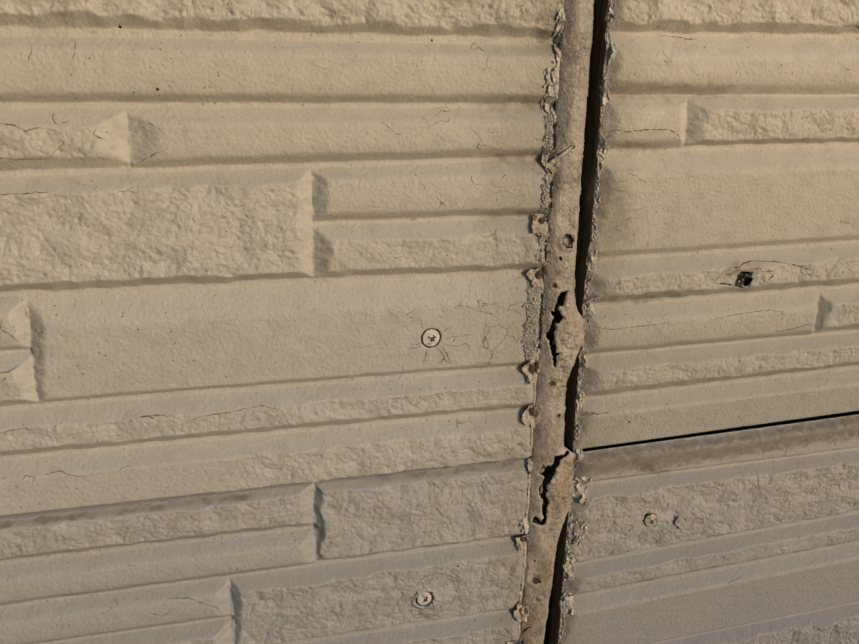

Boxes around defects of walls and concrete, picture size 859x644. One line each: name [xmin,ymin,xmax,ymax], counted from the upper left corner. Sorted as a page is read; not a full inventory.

spalling [507,0,575,644]